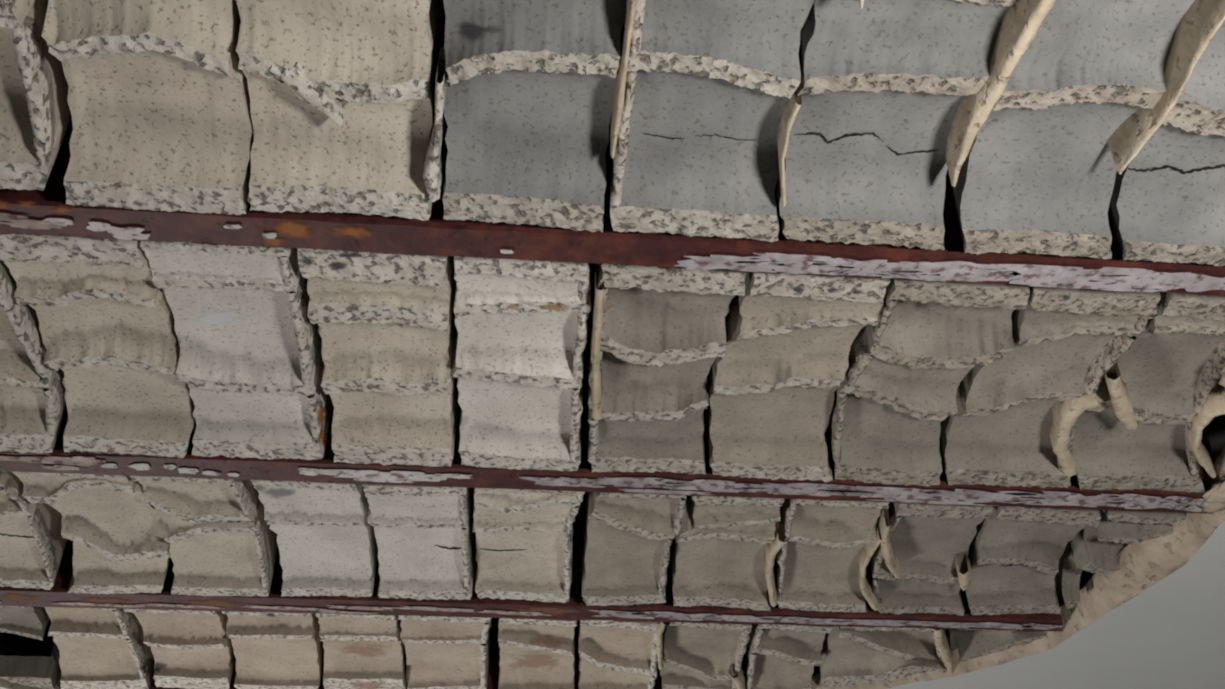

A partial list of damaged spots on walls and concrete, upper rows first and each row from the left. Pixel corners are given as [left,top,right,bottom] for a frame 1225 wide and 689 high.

crack [793,132,938,156]
crack [1125,164,1225,174]
peeling [0,213,150,240]
rust [265,222,308,246]
spalling [329,254,360,269]
peeling [674,253,1225,300]
peeling [0,456,239,477]
peeling [297,468,473,483]
flaking render [519,447,1225,689]
peeling [239,605,552,617]
flaking render [0,671,62,689]